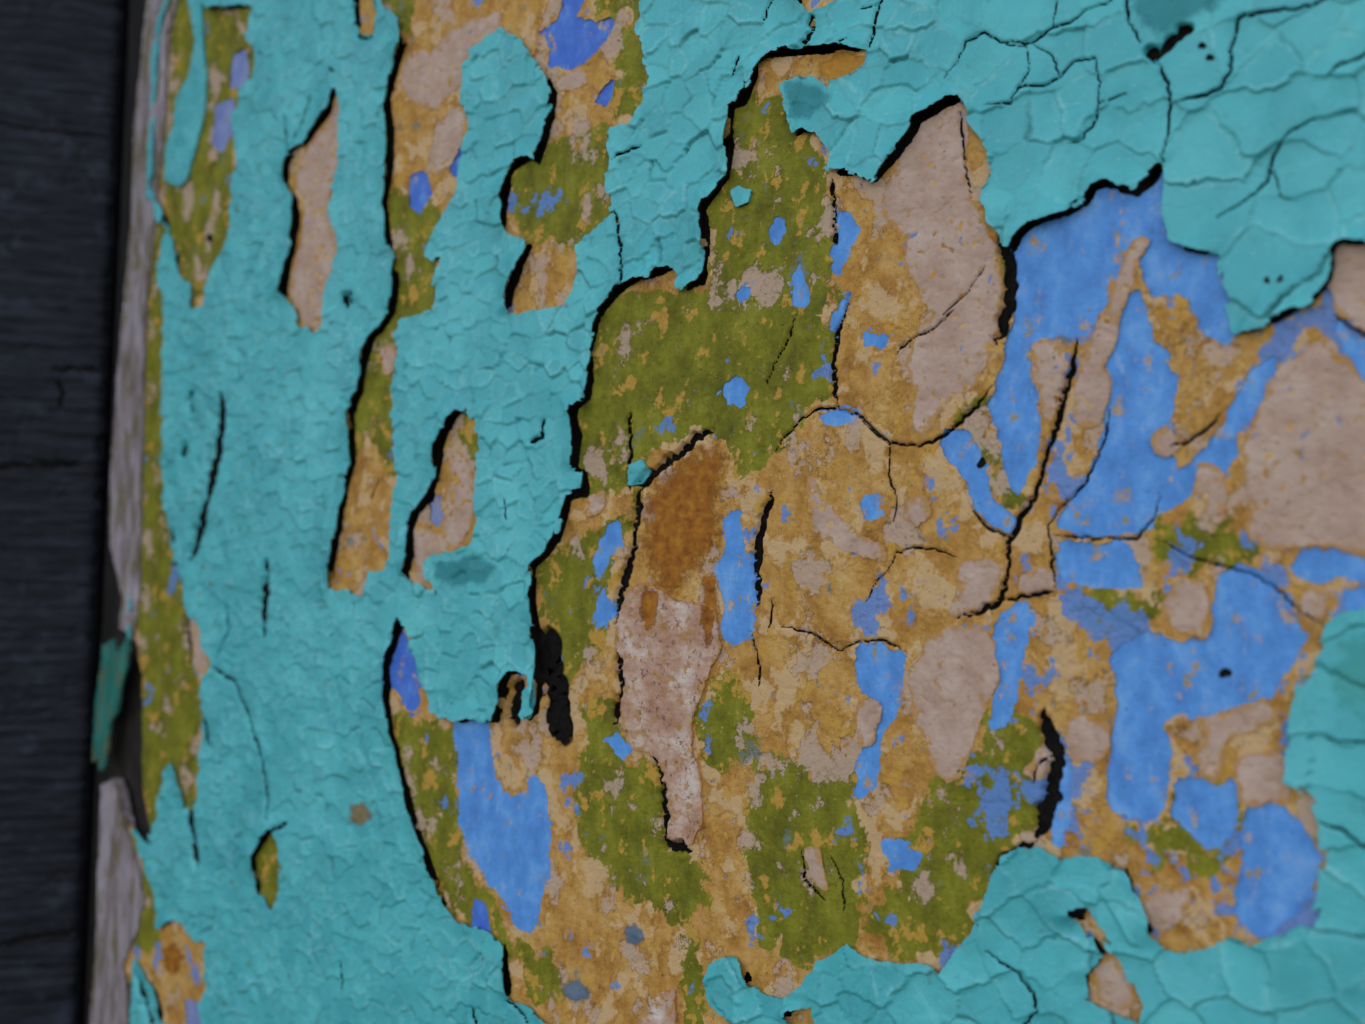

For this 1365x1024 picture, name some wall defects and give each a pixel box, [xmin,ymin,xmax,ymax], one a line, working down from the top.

peeling [286,96,339,333]
peeling [327,0,649,597]
crack [796,0,883,56]
crack [897,238,1019,353]
crack [944,0,1325,193]
peeling [92,0,255,1024]
crack [751,489,908,687]
peeling [390,49,1365,1024]
crack [775,303,996,602]
crack [957,340,1325,627]
peeling [253,829,282,910]
crack [994,709,1066,870]